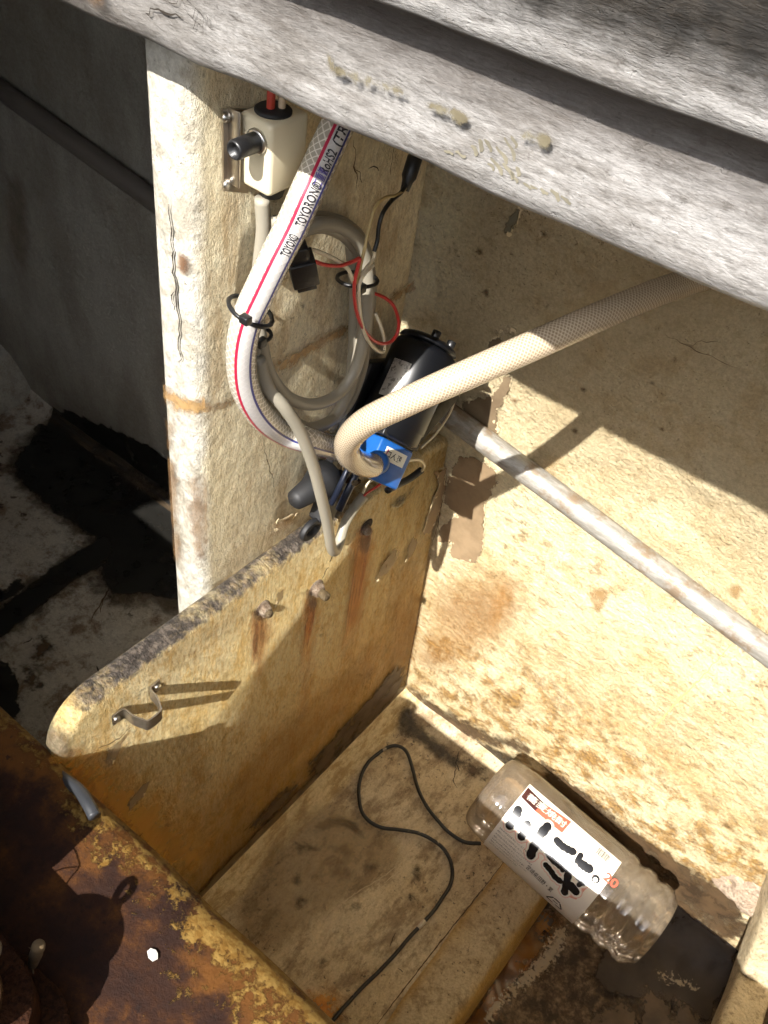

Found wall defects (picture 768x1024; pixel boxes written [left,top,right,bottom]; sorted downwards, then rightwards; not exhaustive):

crack [168,207,182,367]
peeling [460,374,513,434]
peeling [376,456,498,582]
rust [253,610,264,651]
rust [305,590,316,634]
damp [399,686,531,780]
damp [541,760,747,943]